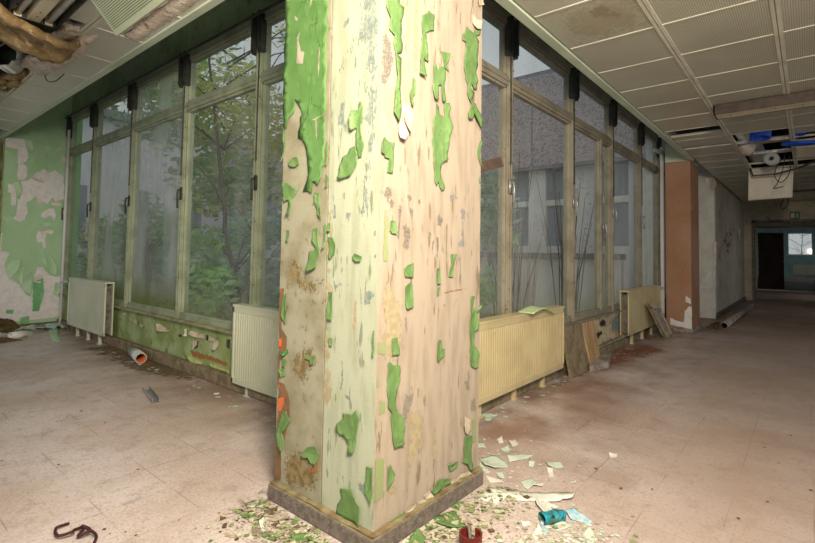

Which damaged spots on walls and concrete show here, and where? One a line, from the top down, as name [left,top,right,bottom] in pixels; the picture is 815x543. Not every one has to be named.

peeling [462,15,483,129]
peeling [0,129,66,324]
peeling [156,323,230,350]
spalling [274,288,291,480]
peeling [335,410,360,454]
peeling [336,459,396,526]
peeling [280,0,453,406]
peeling [353,209,437,474]
peeling [390,399,476,522]
peeling [437,254,457,296]
peeling [464,296,482,390]
peeling [670,242,723,329]